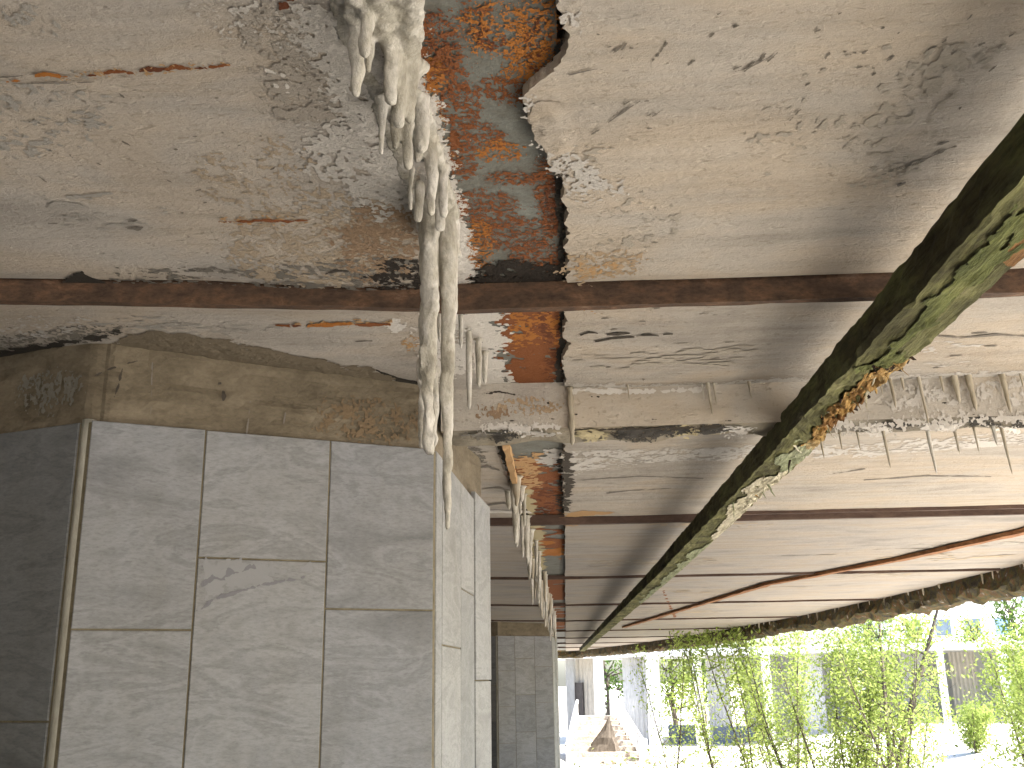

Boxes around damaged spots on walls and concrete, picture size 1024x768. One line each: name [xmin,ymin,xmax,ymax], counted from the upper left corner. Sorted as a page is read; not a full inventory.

corrosion [6,62,231,83]
peeling [245,63,348,110]
leakage [109,0,427,291]
efflorescence [418,75,481,284]
corrosion [421,0,566,283]
crack [882,141,957,187]
corrosion [493,311,567,383]
leakage [475,396,757,476]
spalling [610,419,732,443]
leakage [805,341,1024,460]
corrosion [507,452,614,559]
corrosion [622,528,1024,628]